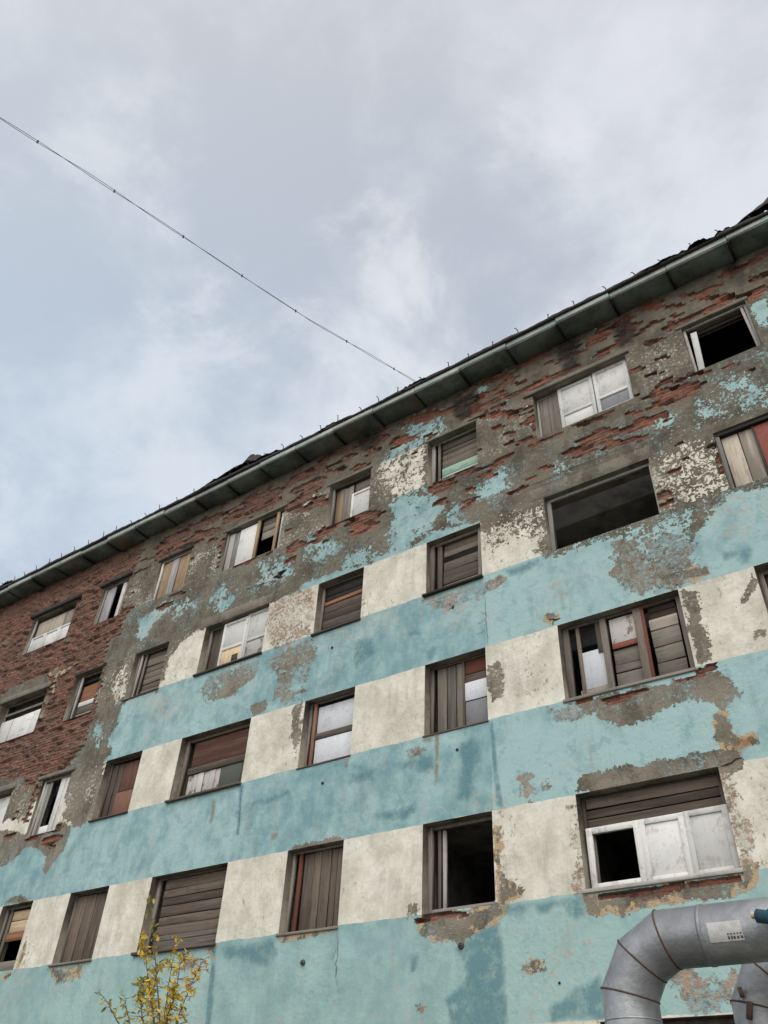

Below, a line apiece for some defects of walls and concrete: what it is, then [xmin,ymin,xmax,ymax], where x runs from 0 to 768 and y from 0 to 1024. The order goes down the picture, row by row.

peeling [0,245,768,918]
peeling [405,825,525,944]
peeling [521,957,547,977]
peeling [670,967,739,1016]